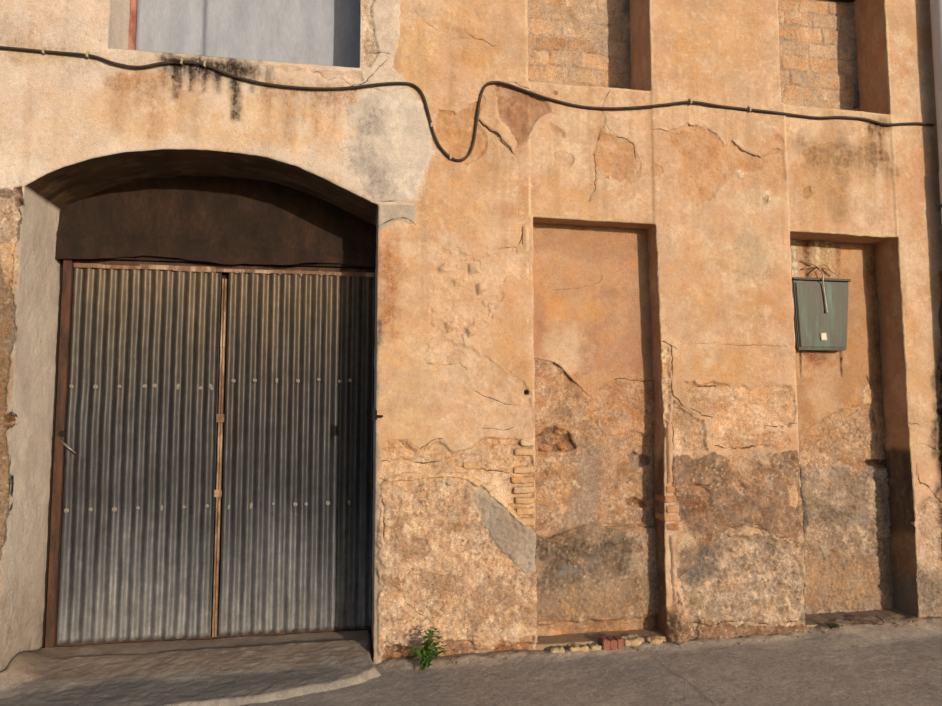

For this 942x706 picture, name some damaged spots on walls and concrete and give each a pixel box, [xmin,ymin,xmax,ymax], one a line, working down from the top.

damp [161,54,256,118]
flaking render [435,84,574,169]
flaking render [592,128,663,185]
flaking render [651,120,787,207]
flaking render [0,189,23,560]
flaking render [381,246,885,532]
damp [933,357,942,475]
flaking render [677,527,812,645]